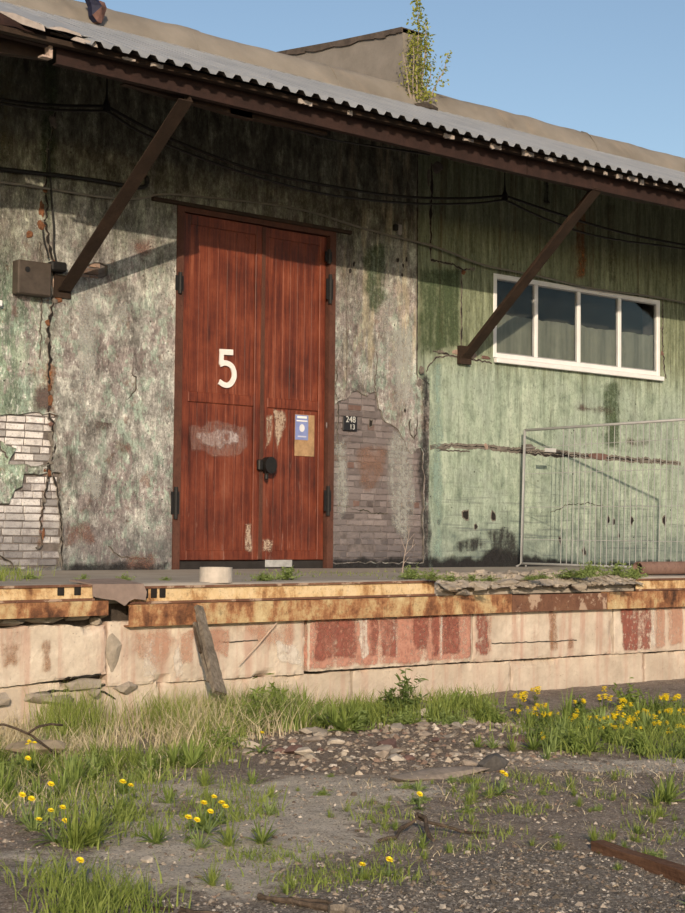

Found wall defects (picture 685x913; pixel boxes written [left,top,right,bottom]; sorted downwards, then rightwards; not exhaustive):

crack [26,112,64,569]
water stain [420,269,459,352]
flaking render [0,388,94,571]
water stain [333,366,581,568]
flaking render [326,389,645,591]
crack [519,450,584,458]
water stain [604,382,619,447]
rust [303,614,490,669]
rust [621,607,683,650]